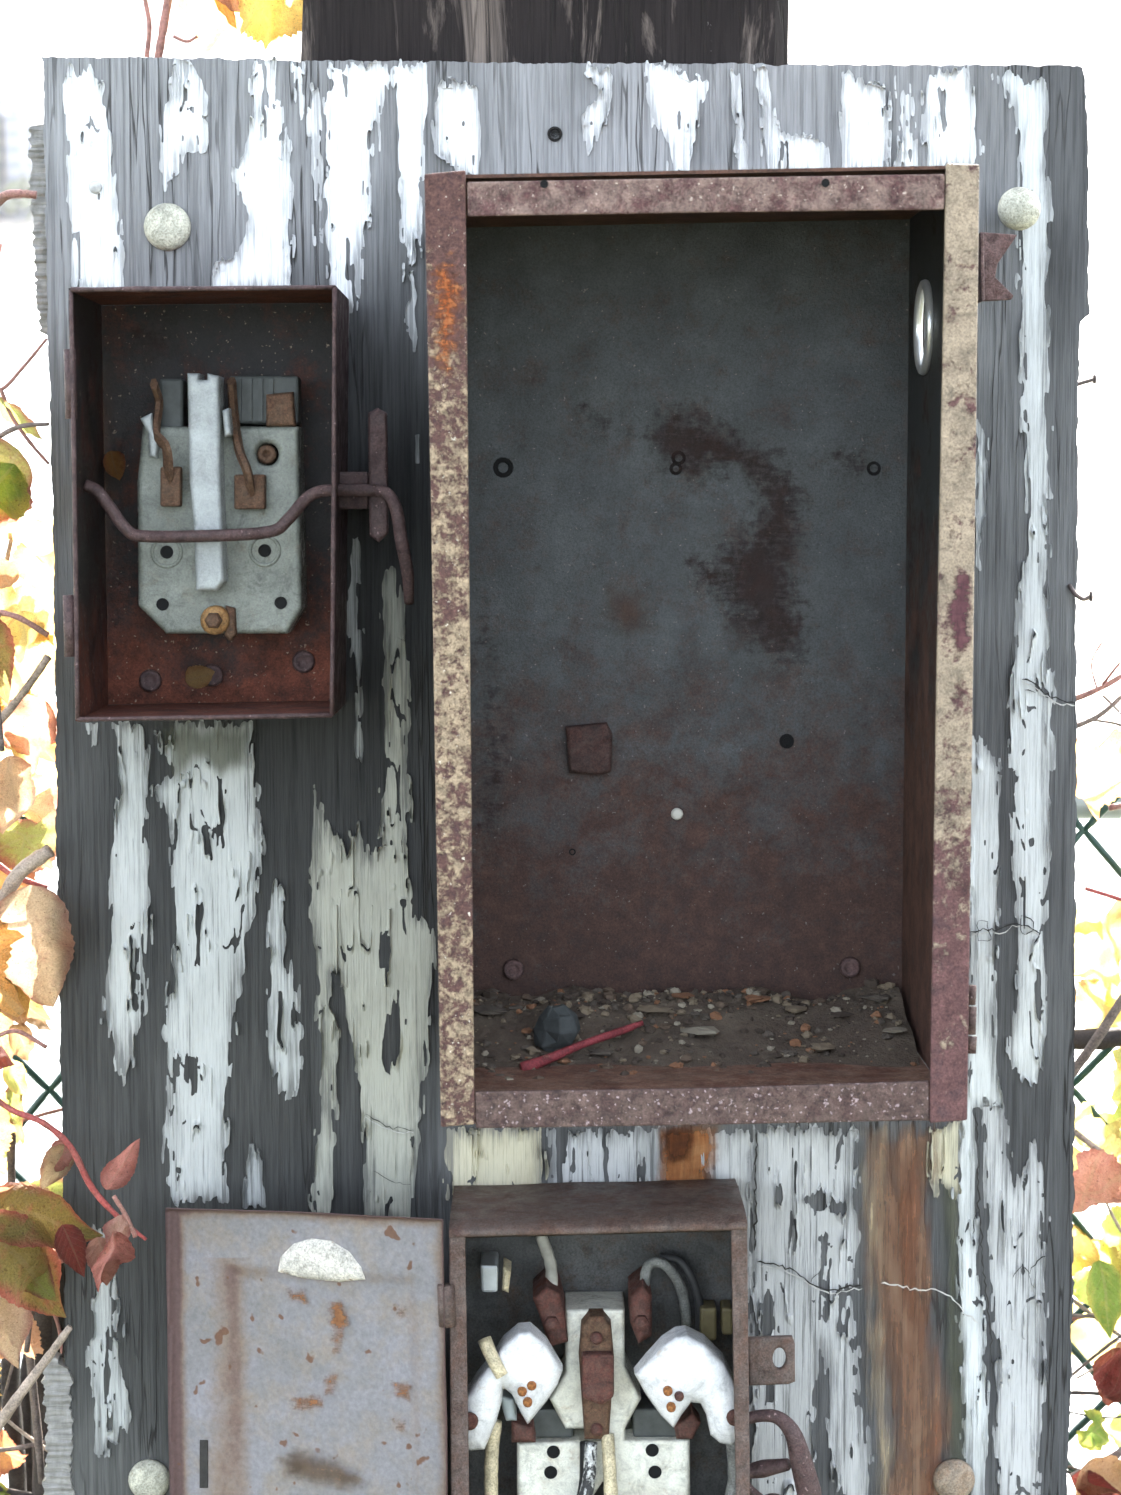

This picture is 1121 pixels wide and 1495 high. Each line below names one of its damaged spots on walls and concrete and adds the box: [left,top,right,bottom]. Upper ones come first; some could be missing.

peeling [63,62,125,287]
peeling [212,56,481,352]
rust [432,252,461,370]
peeling [730,64,985,169]
rust [652,414,803,652]
rust [946,569,972,651]
peeling [85,537,437,1217]
peeling [926,69,1057,1495]
peeling [701,1123,875,1495]
crack [753,1112,1046,1369]
rust [867,1130,942,1495]
rust [287,1456,358,1486]